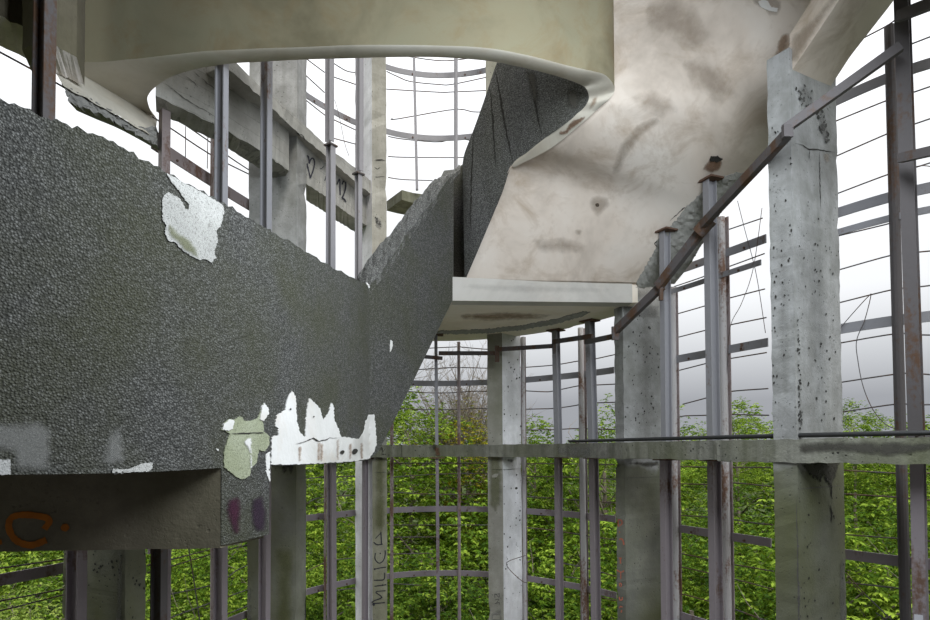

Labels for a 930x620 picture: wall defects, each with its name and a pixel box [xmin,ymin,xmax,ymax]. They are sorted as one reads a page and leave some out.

flaking render [161,173,224,264]
flaking render [0,459,11,475]
flaking render [216,391,377,482]